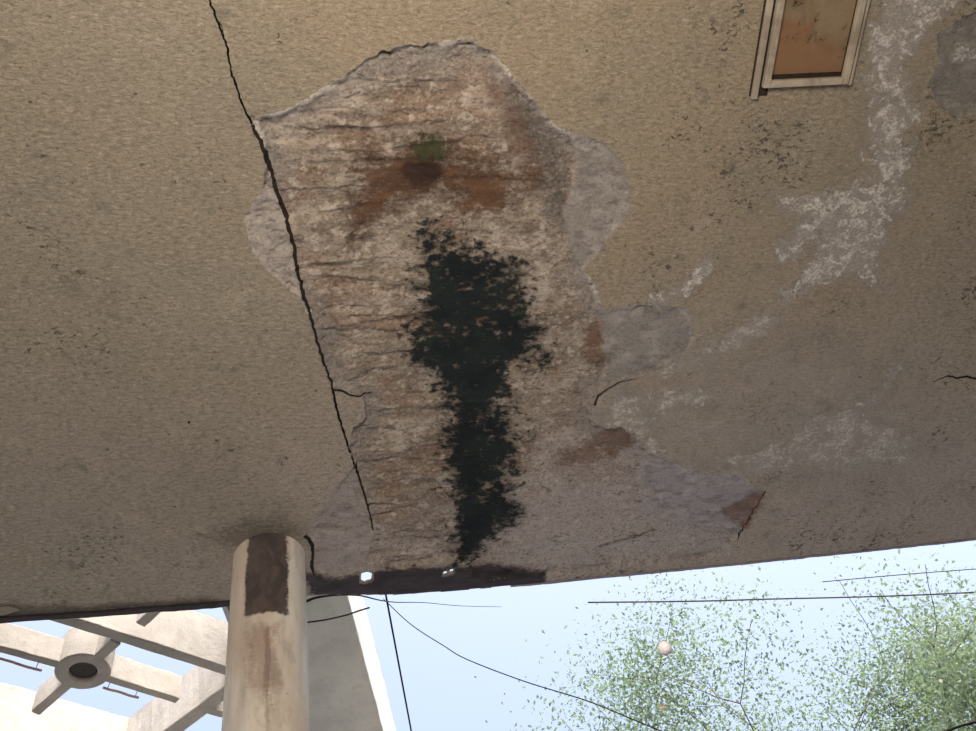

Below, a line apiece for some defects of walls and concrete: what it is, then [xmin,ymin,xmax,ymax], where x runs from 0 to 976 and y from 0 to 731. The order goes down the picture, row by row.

flaking render [929,12,976,118]
rust [348,132,531,241]
leakage [775,0,958,303]
crack [209,0,374,530]
leakage [306,216,556,595]
flaking render [244,39,766,582]
leakage [649,255,714,305]
leakage [606,308,783,460]
leakage [717,363,911,473]
crack [933,374,976,382]